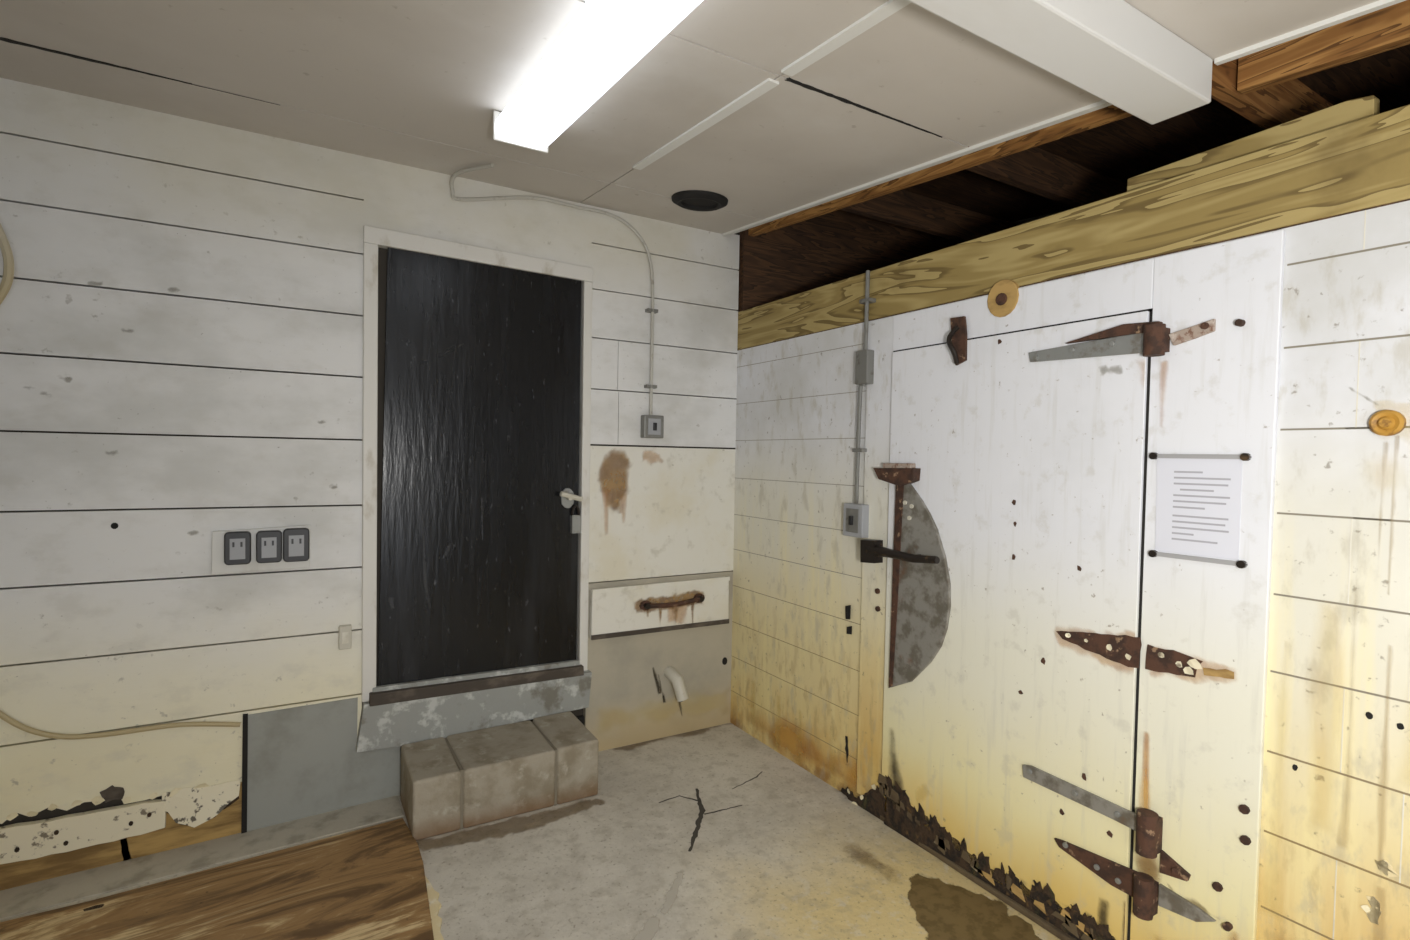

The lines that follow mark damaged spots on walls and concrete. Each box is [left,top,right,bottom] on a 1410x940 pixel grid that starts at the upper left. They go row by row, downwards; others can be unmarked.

corrosion [600,453,629,508]
peeling [6,785,131,821]
peeling [149,780,241,828]
crack [634,772,762,940]
spalling [1375,859,1399,877]
water stain [908,874,1041,940]
spalling [1361,896,1382,925]